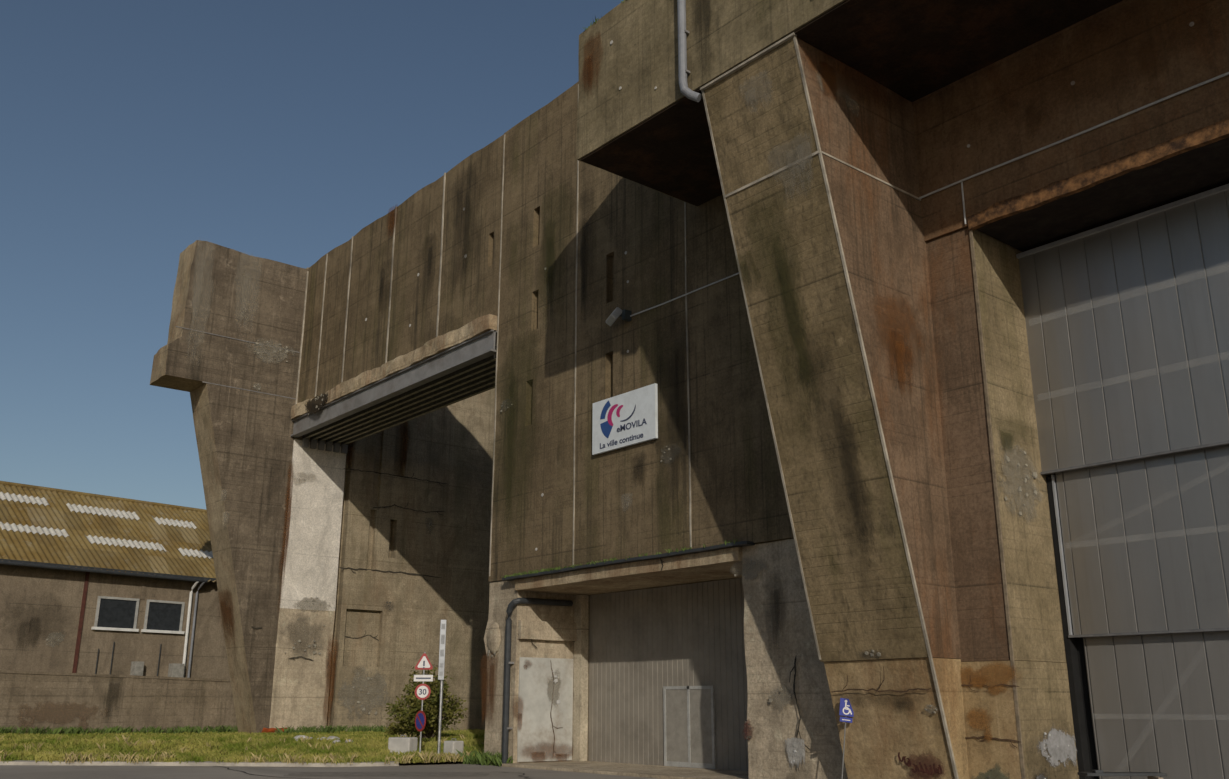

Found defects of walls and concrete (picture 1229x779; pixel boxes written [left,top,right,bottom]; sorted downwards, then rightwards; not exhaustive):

rust [967,117,1229,231]
crack [518,634,575,756]
crack [832,666,931,693]
rust [960,664,1016,695]
crack [961,675,1019,692]
crack [789,657,810,771]
crack [965,736,1020,748]